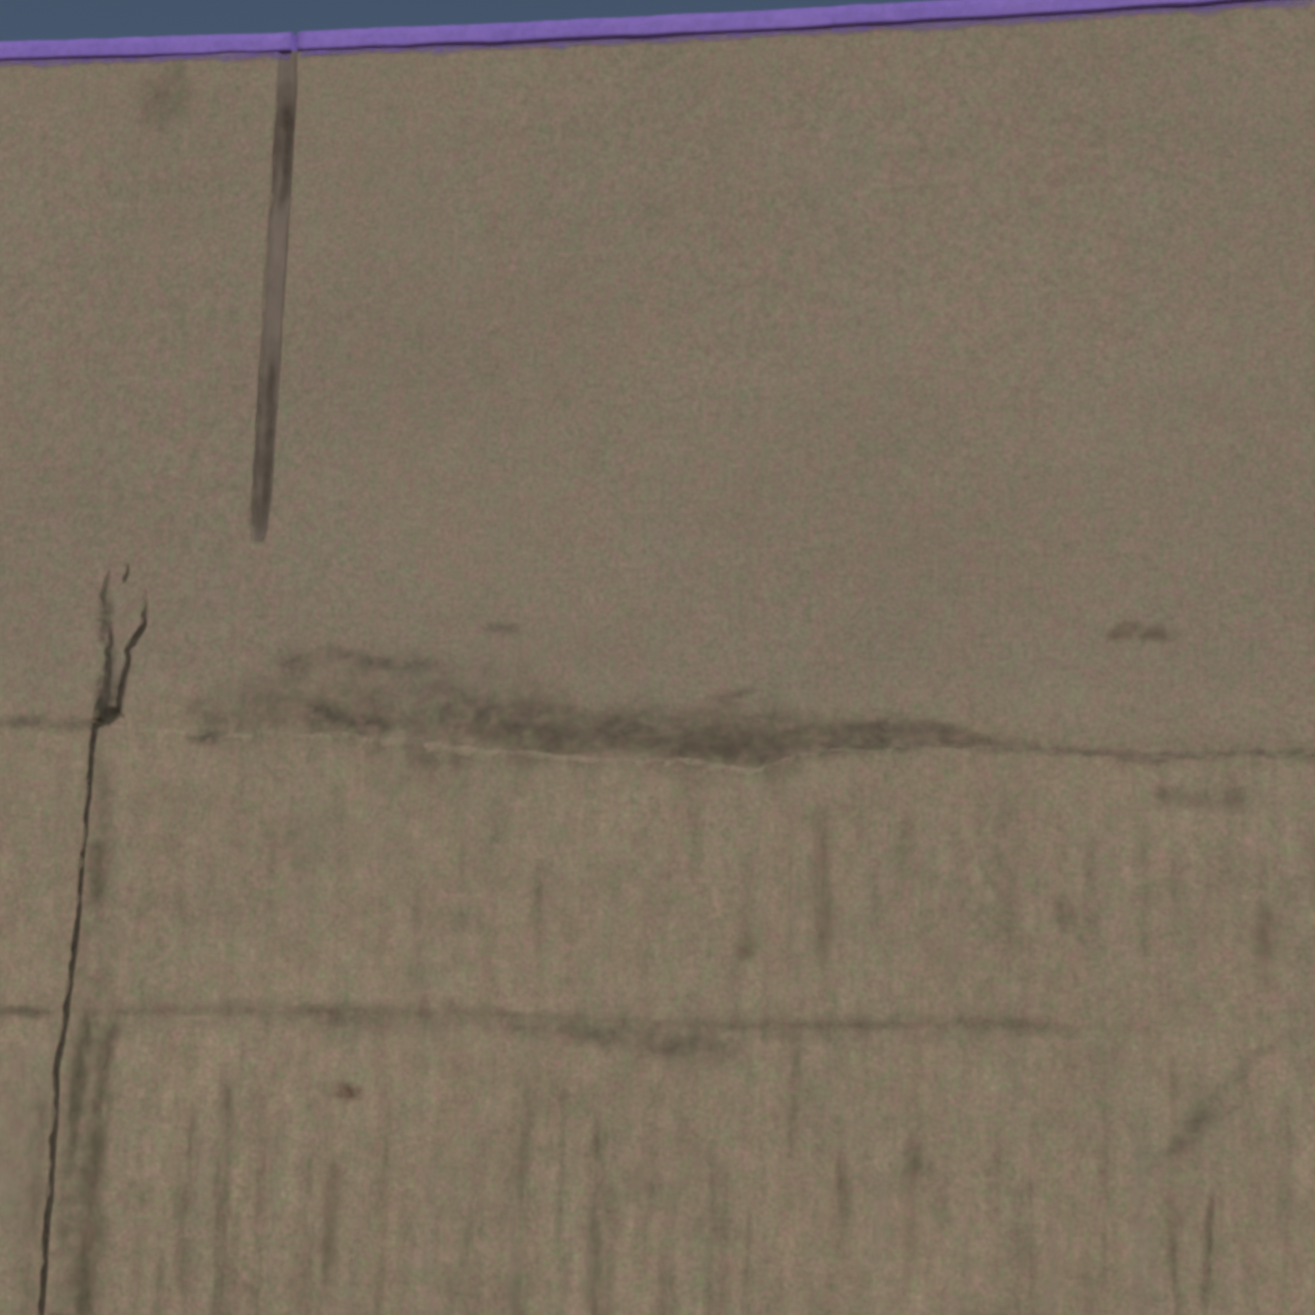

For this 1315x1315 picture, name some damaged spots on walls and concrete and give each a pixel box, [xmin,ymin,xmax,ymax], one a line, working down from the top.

crack [38,610,147,1315]